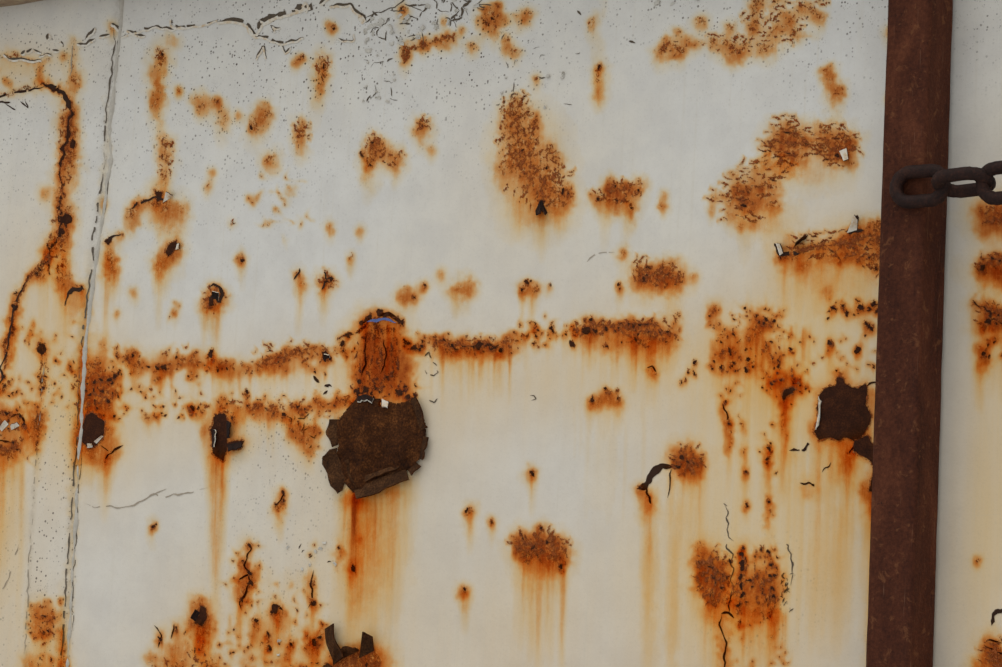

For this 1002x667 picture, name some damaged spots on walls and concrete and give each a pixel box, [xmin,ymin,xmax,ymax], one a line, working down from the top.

crack [104,0,366,141]
rust [495,90,574,215]
rust [707,114,862,222]
crack [0,46,206,655]
rust [0,249,681,451]
spalling [208,411,244,463]
spalling [289,394,438,499]
spalling [789,372,876,504]
rust [148,543,327,667]
spalling [323,623,382,667]
crack [718,503,734,667]
rust [691,545,784,626]